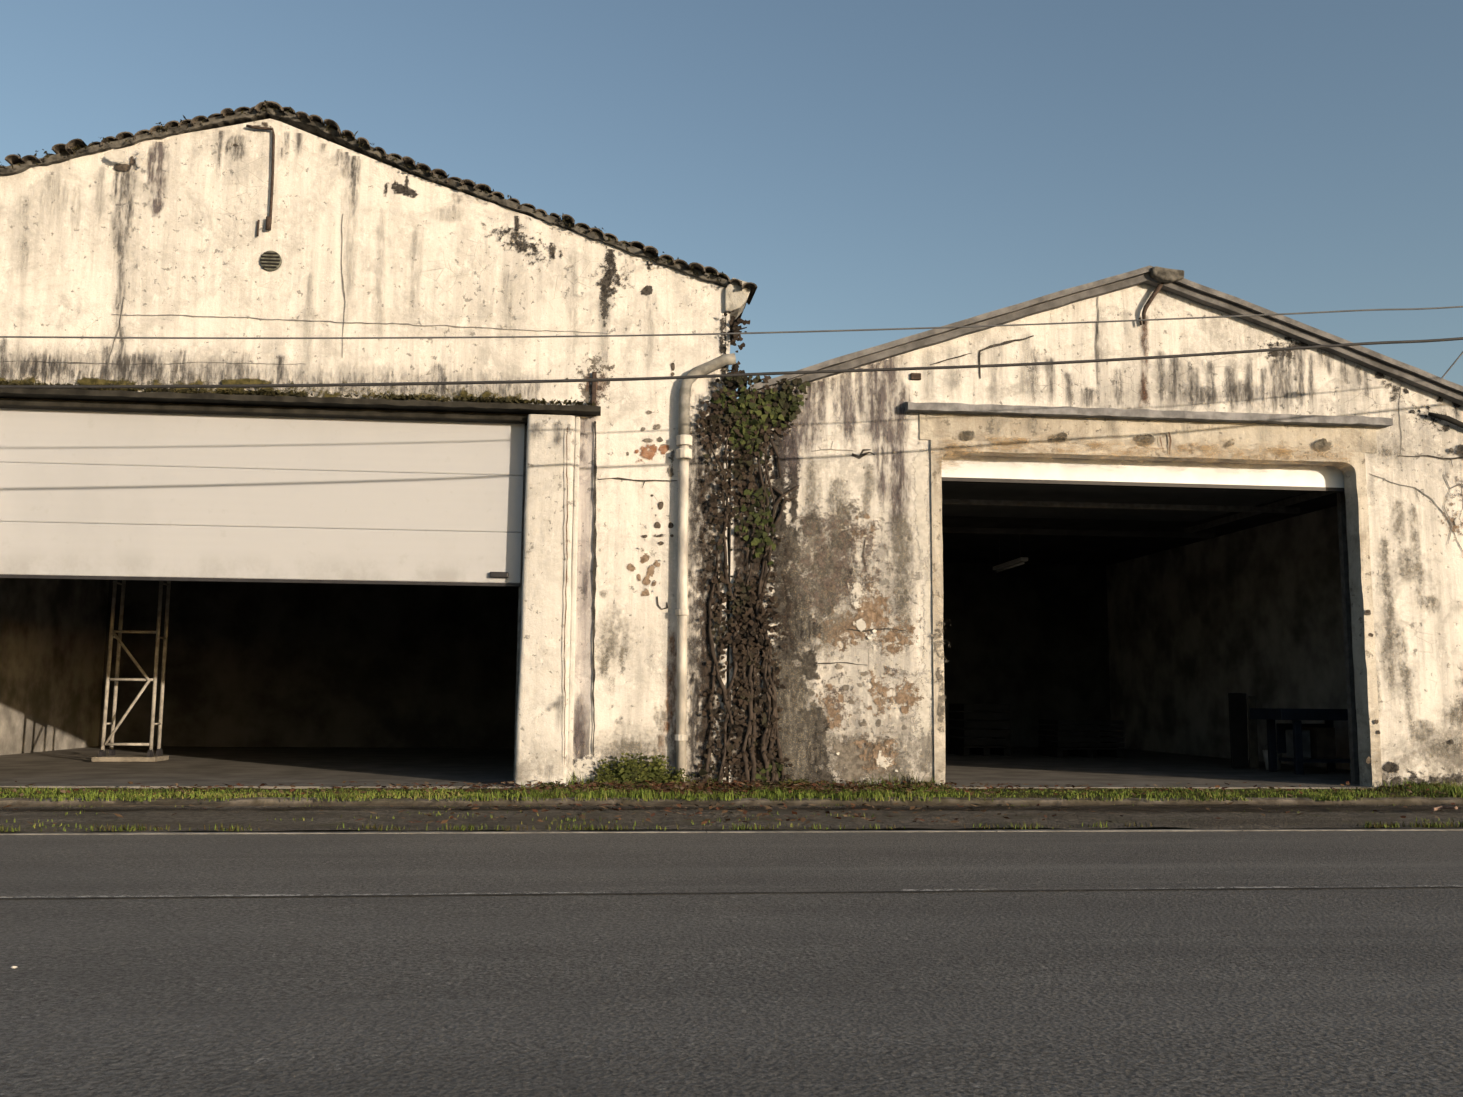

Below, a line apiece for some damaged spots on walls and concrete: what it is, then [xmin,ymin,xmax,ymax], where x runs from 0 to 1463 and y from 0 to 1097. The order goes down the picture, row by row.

damp [148,141,166,214]
damp [115,170,132,304]
damp [593,246,653,327]
damp [0,336,537,399]
damp [1032,358,1093,405]
damp [1157,336,1409,406]
flaking render [626,410,674,477]
crack [1369,386,1463,551]
peeling [627,494,674,596]
damp [601,622,627,674]
peeling [781,449,934,785]
damp [549,697,669,777]